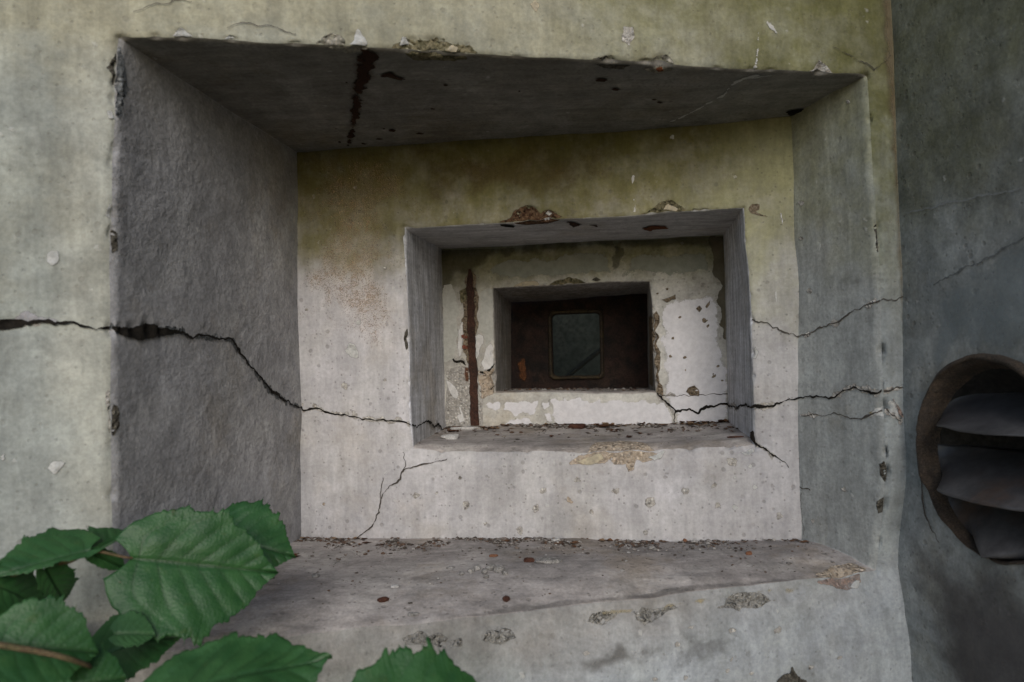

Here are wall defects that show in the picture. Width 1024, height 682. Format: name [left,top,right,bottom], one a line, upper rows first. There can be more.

spalling [392,37,477,61]
rust [338,49,406,146]
spalling [501,205,562,228]
spalling [641,200,686,215]
crack [752,296,903,338]
peeling [440,252,728,439]
crack [0,319,443,430]
spalling [569,441,665,472]
crack [657,383,903,535]
crack [356,452,447,538]
spalling [816,563,866,590]
spalling [718,592,775,611]